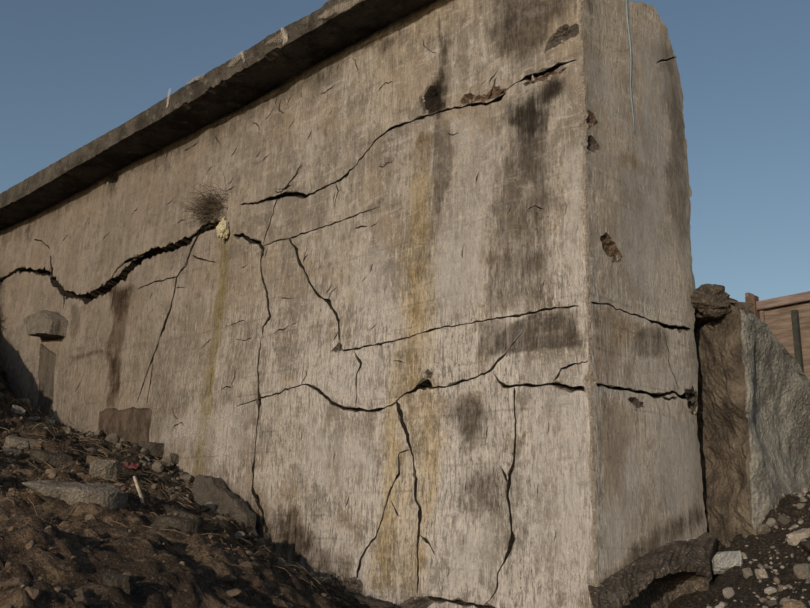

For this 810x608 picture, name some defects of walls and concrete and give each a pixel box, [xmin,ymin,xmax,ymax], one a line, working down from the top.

spalling [544,23,579,53]
spalling [422,85,441,110]
spalling [459,85,507,106]
spalling [586,109,600,153]
spalling [600,232,623,263]
crack [0,59,696,608]
spalling [684,386,698,415]